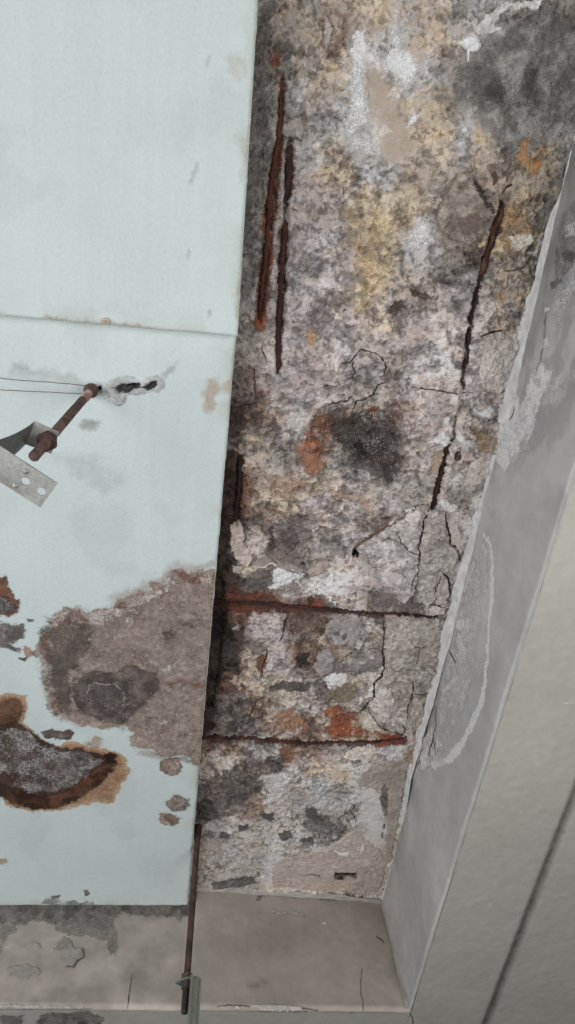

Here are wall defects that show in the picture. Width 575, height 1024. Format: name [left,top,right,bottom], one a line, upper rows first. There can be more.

peeling [459,0,543,61]
rust [253,133,286,333]
spalling [258,76,295,375]
spalling [436,169,534,253]
rust [499,202,534,256]
crack [319,349,387,411]
water stain [323,407,404,486]
water stain [0,403,249,812]
peeling [202,270,519,896]
crack [353,504,461,608]
rust [323,683,415,769]
crack [360,620,436,765]